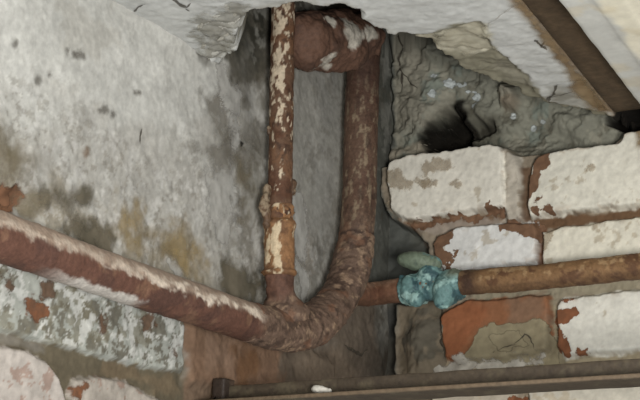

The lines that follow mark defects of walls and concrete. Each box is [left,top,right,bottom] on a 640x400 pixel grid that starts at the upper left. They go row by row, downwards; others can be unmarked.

crack [398,35,417,93]
water stain [443,78,481,108]
crack [546,85,574,103]
spalling [422,104,479,153]
water stain [0,131,21,177]
water stain [204,95,260,245]
water stain [16,186,116,253]
peeling [407,152,556,270]
peeling [24,280,56,323]
peeling [142,313,158,331]
water stain [219,258,265,302]
peeling [555,298,588,358]